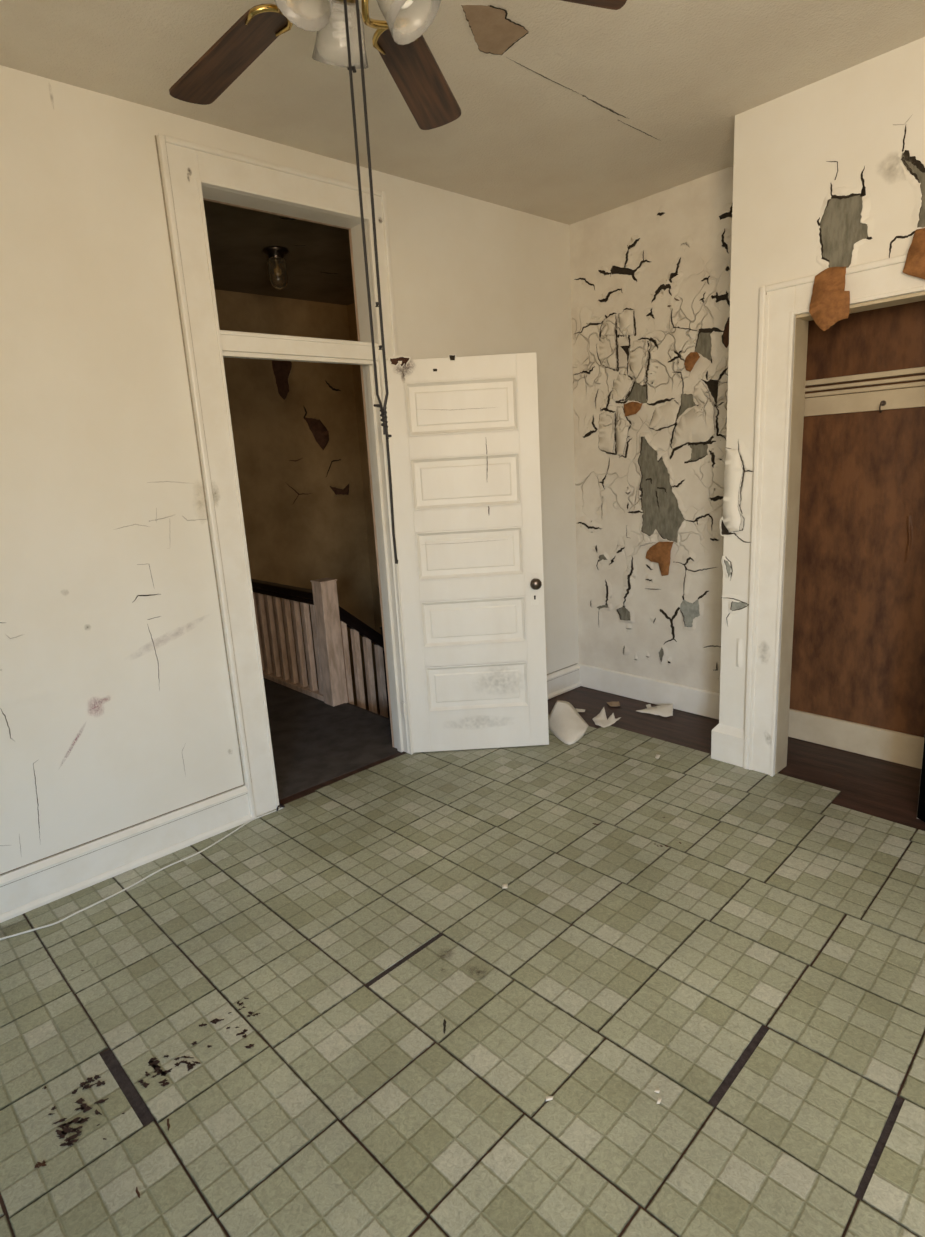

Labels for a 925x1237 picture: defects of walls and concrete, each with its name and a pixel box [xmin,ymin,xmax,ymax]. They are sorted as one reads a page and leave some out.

crack [505,57,661,141]
peeling [889,125,925,279]
peeling [809,161,875,331]
peeling [616,333,651,417]
peeling [635,288,730,576]
spalling [719,516,751,545]
spalling [587,545,614,628]
peeling [655,591,749,667]
crack [0,760,40,857]